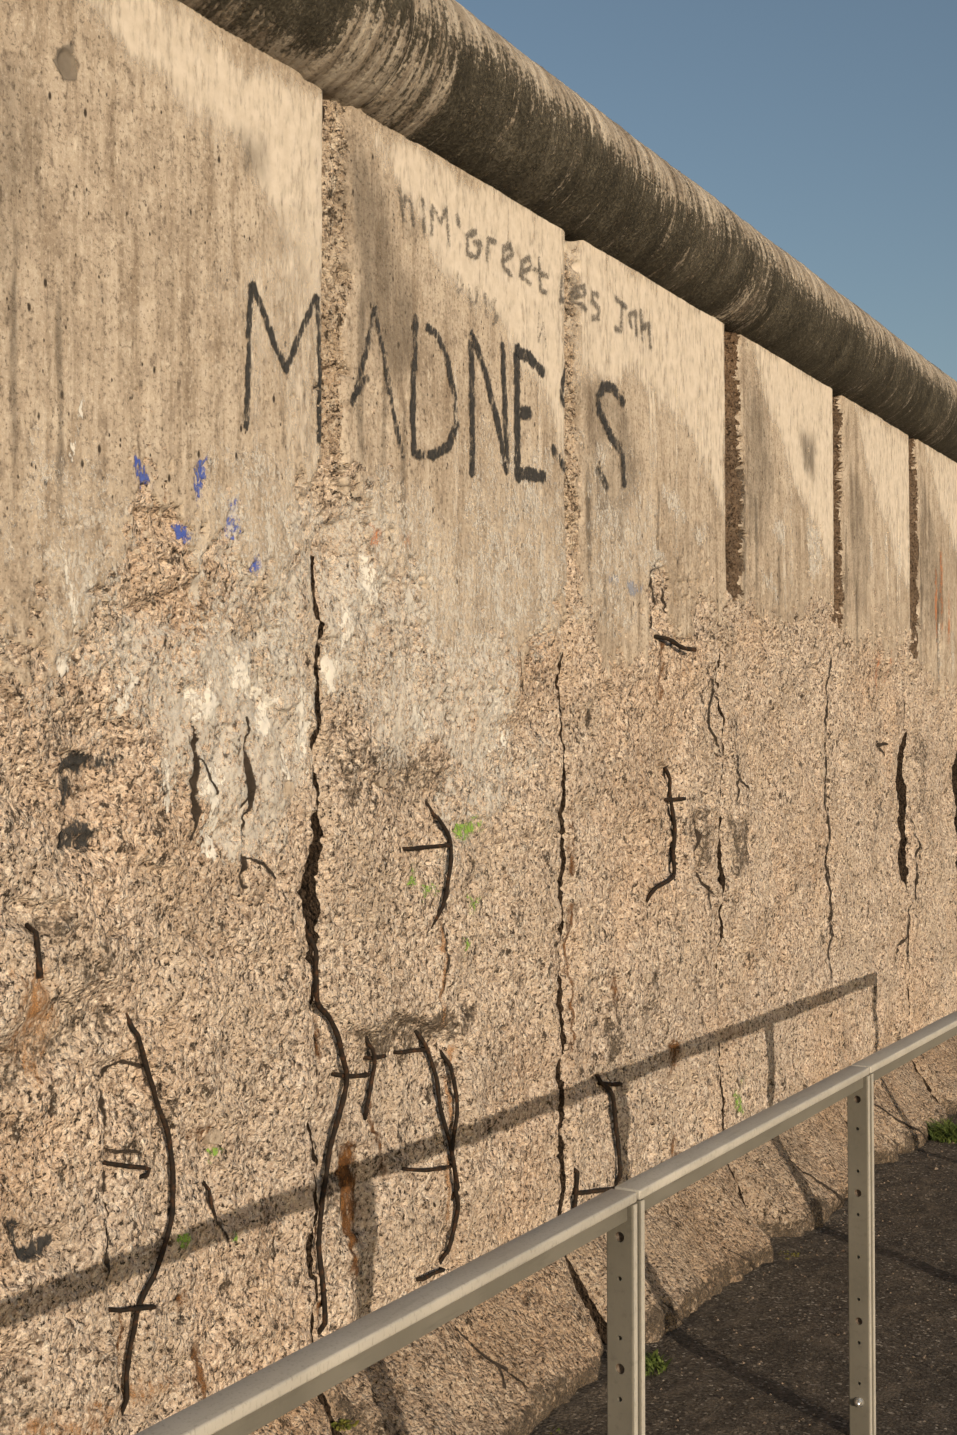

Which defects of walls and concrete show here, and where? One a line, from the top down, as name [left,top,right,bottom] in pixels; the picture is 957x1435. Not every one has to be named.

crack [189,716,276,889]
spalling [0,99,726,1435]
spalling [716,331,957,1130]
corrosion [334,1141,359,1276]
corrosion [367,1102,386,1173]